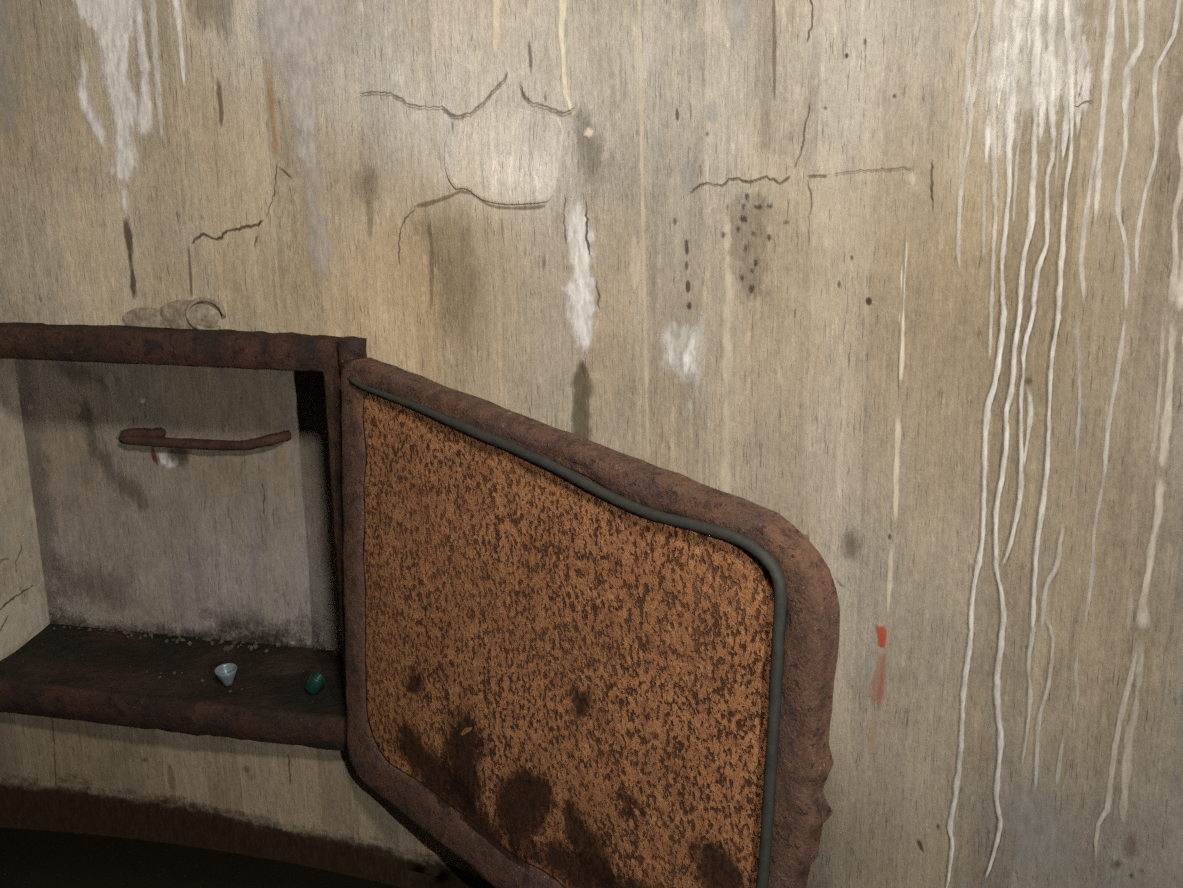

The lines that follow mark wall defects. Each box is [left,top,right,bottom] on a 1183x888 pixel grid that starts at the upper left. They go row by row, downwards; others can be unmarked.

water stain [72,0,162,295]
crack [193,167,291,243]
crack [398,210,414,263]
crack [362,72,574,117]
water stain [562,199,596,439]
crack [806,0,814,40]
crack [690,105,934,207]
water stain [1079,0,1180,305]
water stain [1169,116,1183,310]
water stain [1137,326,1183,627]
water stain [0,780,494,888]
water stain [1094,645,1144,854]